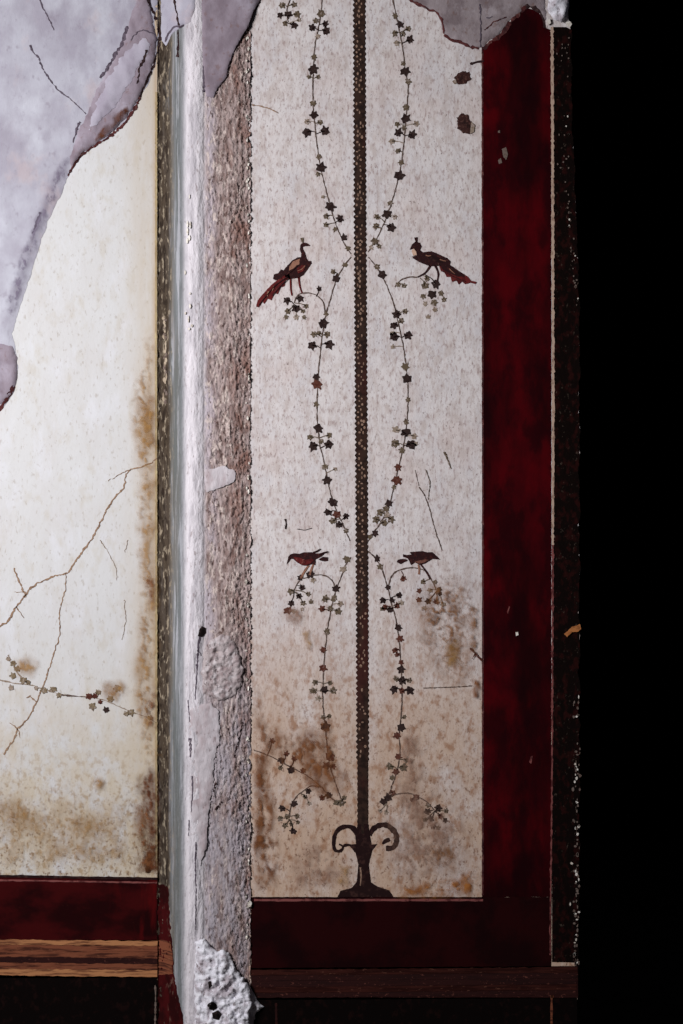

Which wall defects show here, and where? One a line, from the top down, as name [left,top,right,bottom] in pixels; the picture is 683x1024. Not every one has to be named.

spalling [67,0,162,176]
spalling [202,0,261,96]
flaking render [452,71,472,84]
flaking render [456,113,475,134]
spalling [409,0,546,50]
damp [135,382,154,726]
crack [0,458,157,755]
damp [425,589,476,670]
damp [404,875,472,895]